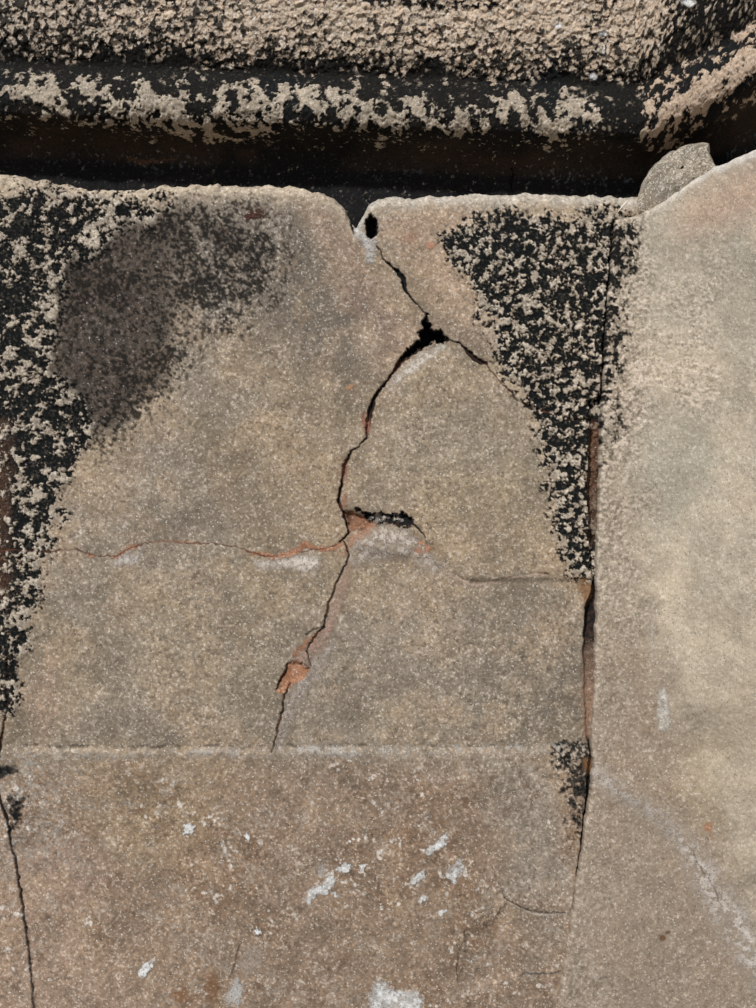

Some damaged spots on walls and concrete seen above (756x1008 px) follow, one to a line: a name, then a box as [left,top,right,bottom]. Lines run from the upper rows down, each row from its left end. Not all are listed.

crack [0,541,151,559]
water stain [0,177,177,718]
spalling [276,507,440,751]
crack [184,185,614,752]
crack [0,795,34,1005]
crack [578,738,591,858]